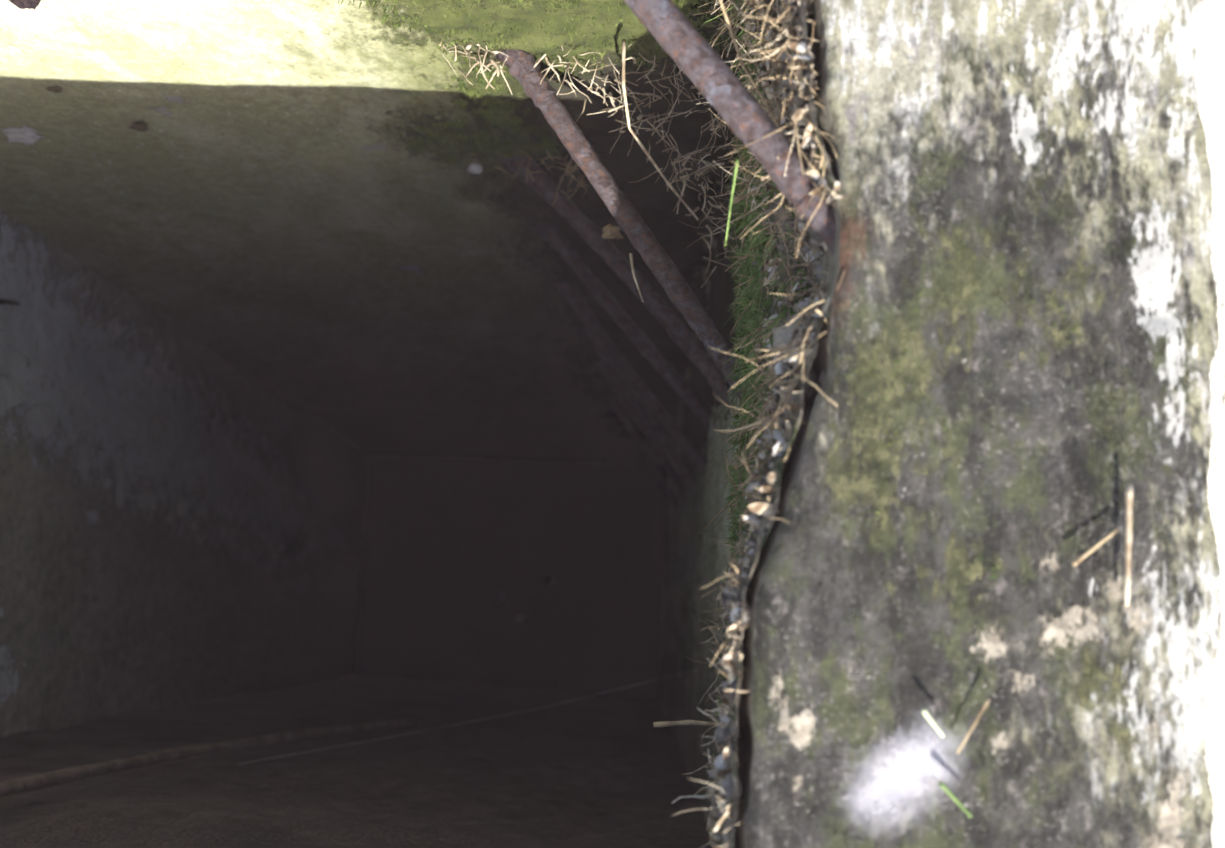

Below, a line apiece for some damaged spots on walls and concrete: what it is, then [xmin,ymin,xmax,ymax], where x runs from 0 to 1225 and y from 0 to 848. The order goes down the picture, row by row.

rust [494,47,558,108]
damp [1129,199,1200,461]